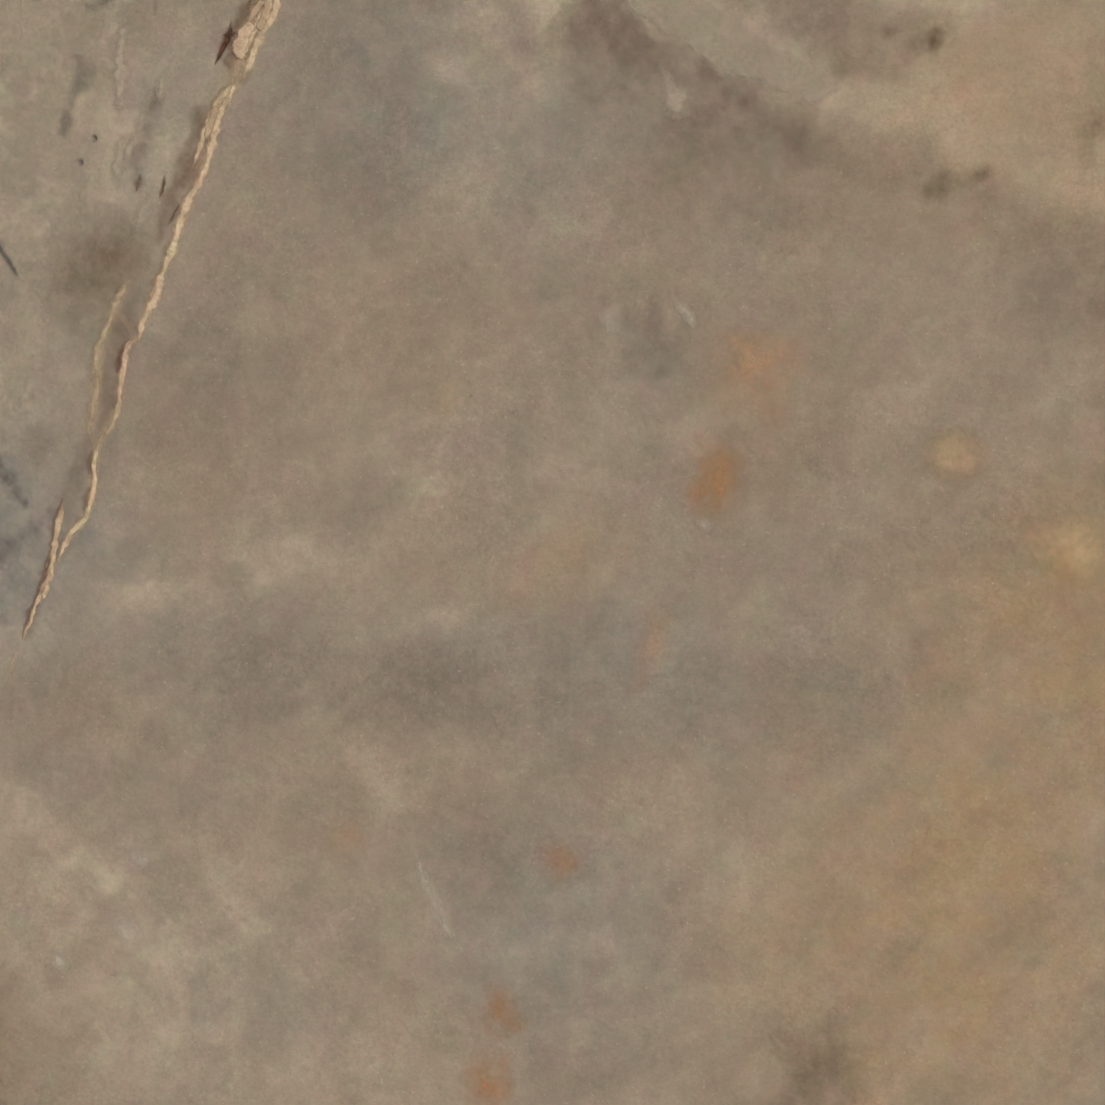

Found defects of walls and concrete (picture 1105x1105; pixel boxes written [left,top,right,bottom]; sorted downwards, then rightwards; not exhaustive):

crack [23,0,281,638]